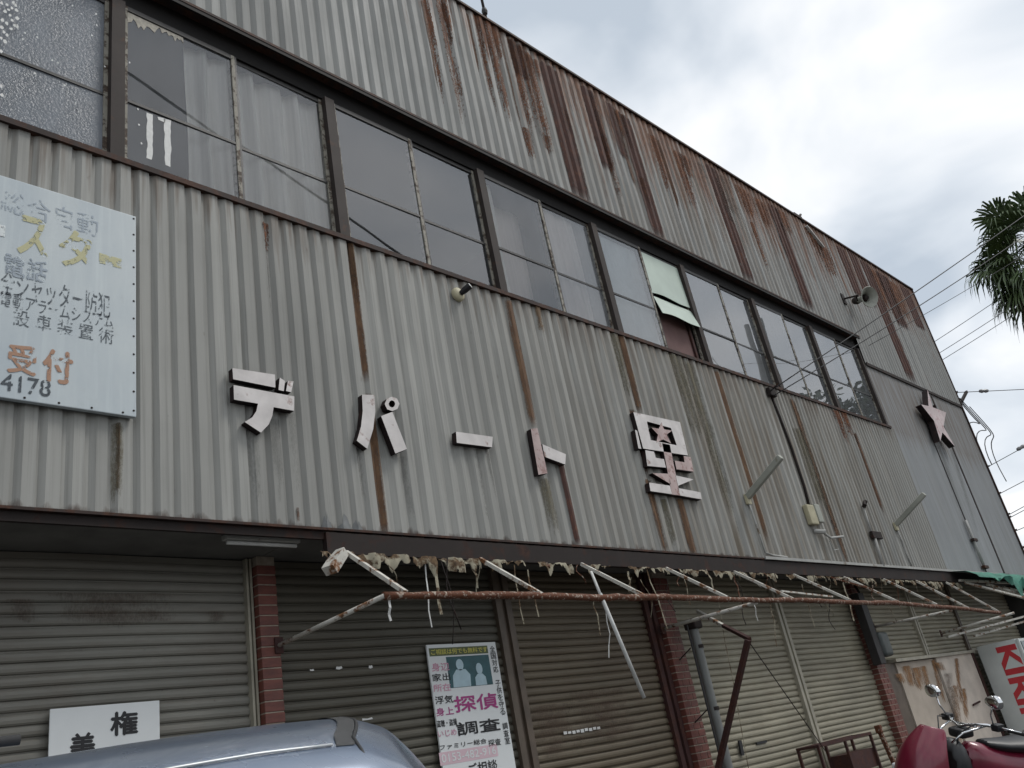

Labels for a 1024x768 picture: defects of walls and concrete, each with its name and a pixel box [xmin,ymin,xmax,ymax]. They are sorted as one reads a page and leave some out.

rust [421,0,466,121]
rust [466,14,590,199]
rust [580,86,664,235]
rust [648,133,813,306]
rust [346,243,369,375]
rust [506,300,535,422]
rust [807,230,925,377]
rust [370,418,388,530]
rust [714,371,766,535]